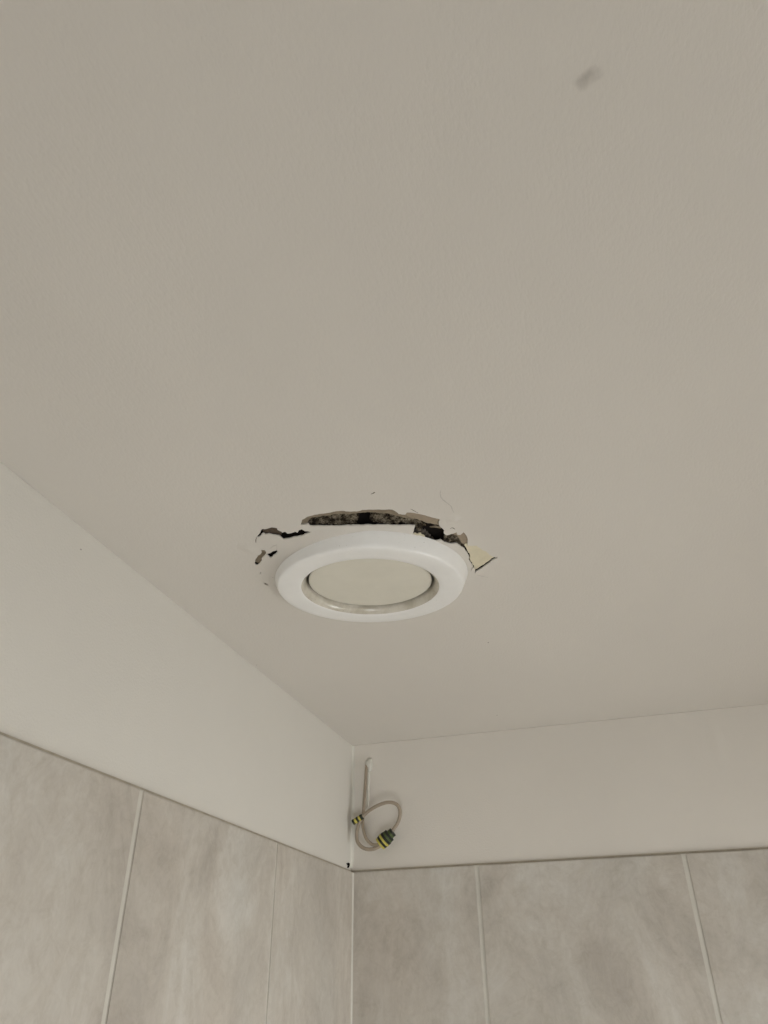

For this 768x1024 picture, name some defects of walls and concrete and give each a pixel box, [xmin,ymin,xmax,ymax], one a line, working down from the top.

spalling [301,509,496,578]